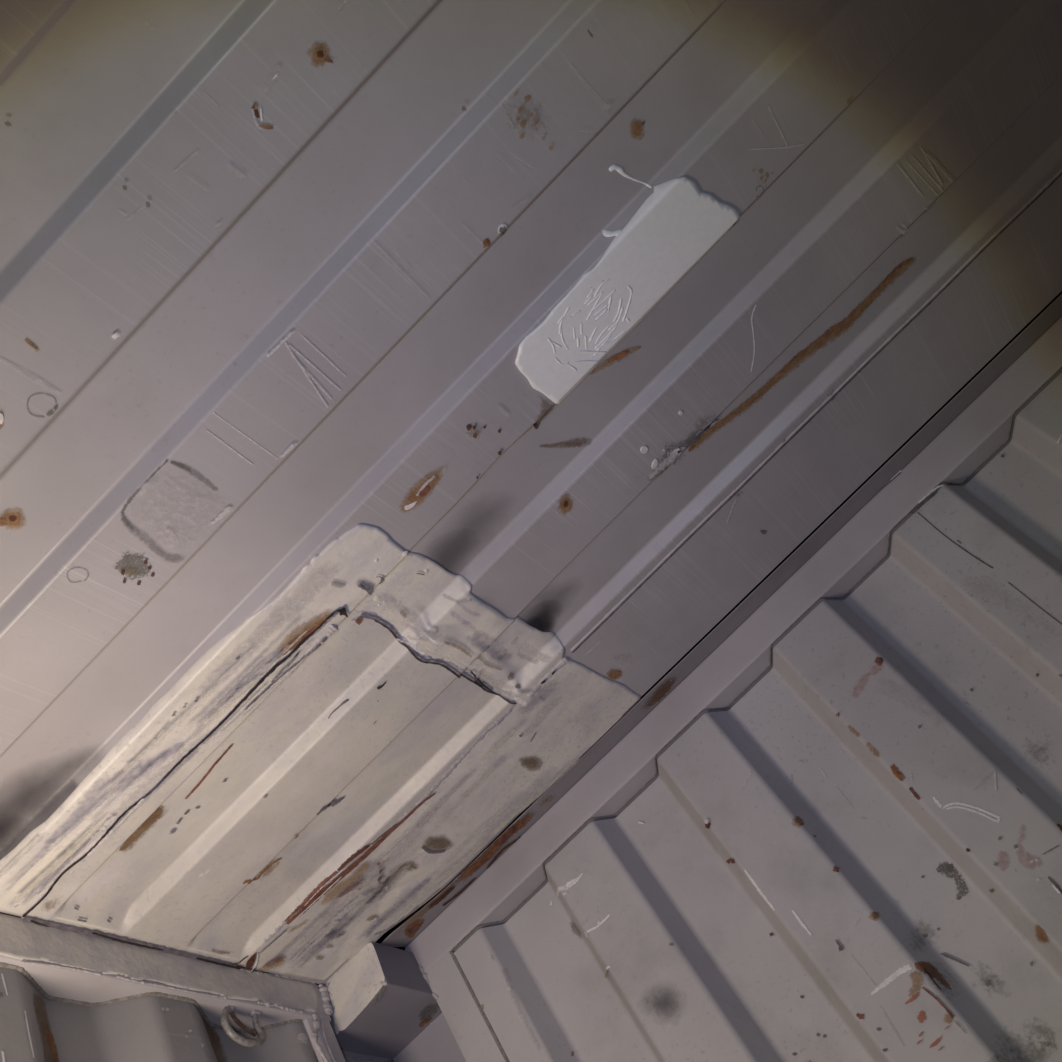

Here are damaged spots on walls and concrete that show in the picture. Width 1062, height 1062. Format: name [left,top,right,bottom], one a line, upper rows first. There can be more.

rust [308,43,333,65]
rust [631,120,645,139]
rust [689,258,913,452]
rust [559,496,572,514]
rust [0,509,24,529]
crack [22,585,517,969]
rust [317,797,345,815]
rust [243,858,282,884]
rust [404,813,532,937]
rust [905,961,965,1050]
rust [34,995,58,1062]